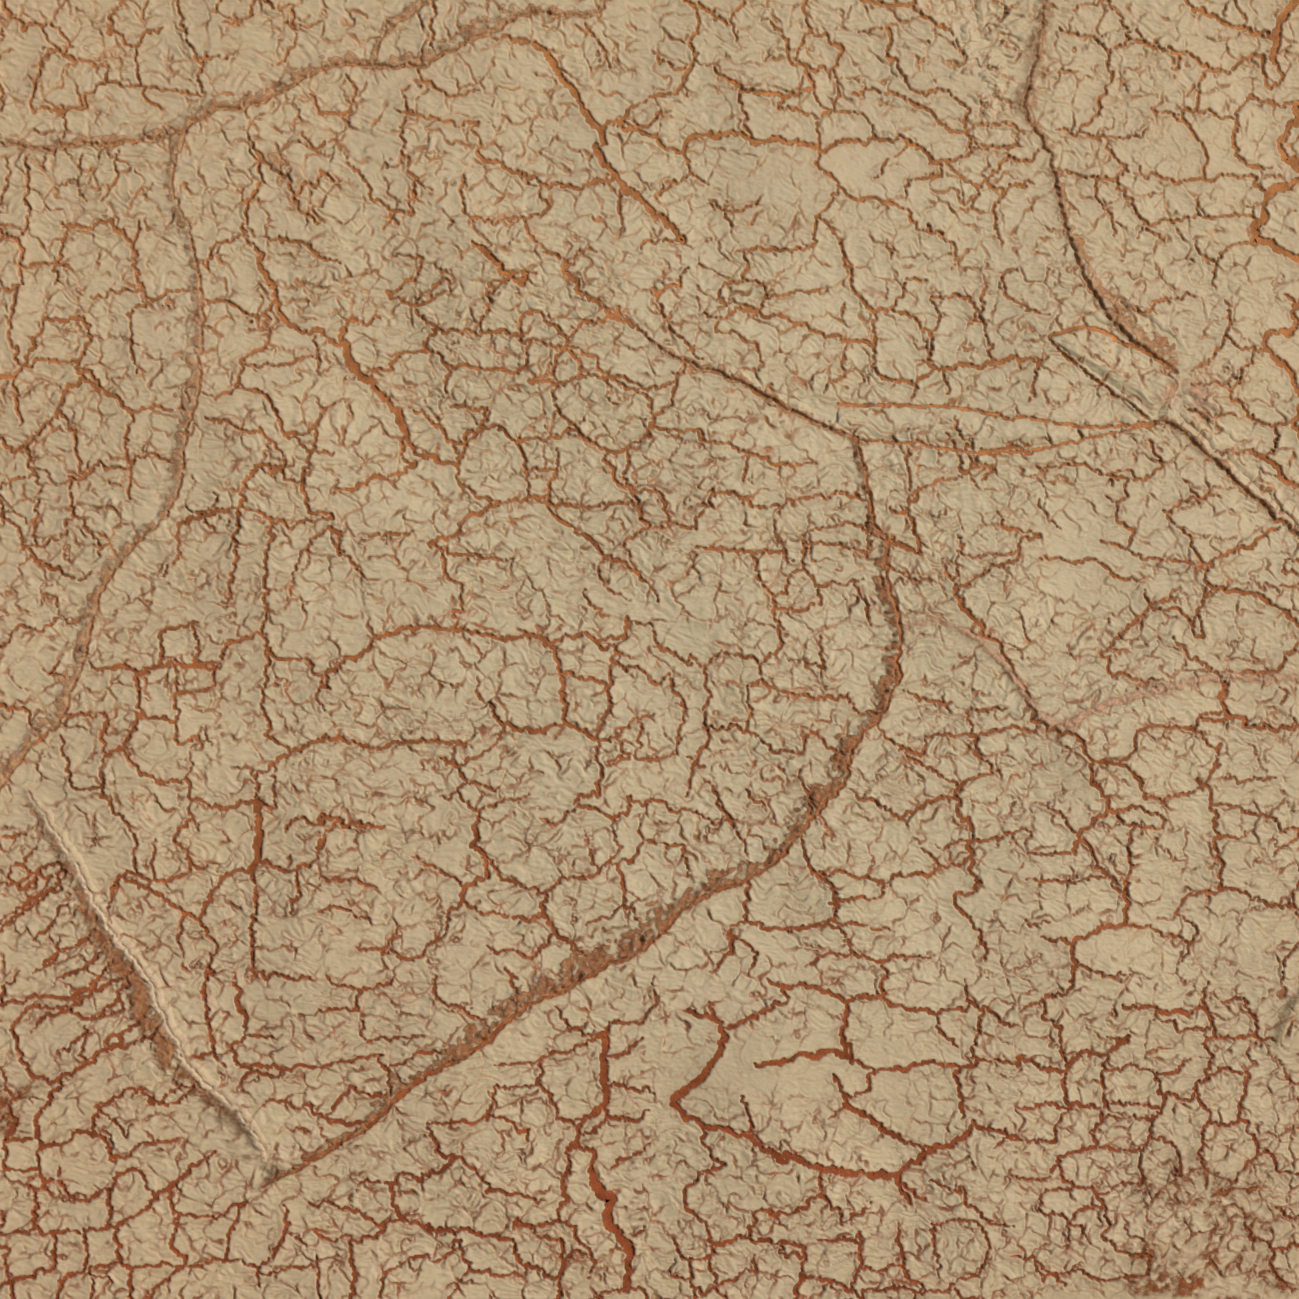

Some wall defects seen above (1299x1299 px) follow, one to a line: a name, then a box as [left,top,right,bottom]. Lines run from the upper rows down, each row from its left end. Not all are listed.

crack [0,952,321,1299]
crack [0,0,1047,1067]
crack [214,239,1299,1299]
crack [1022,0,1299,373]